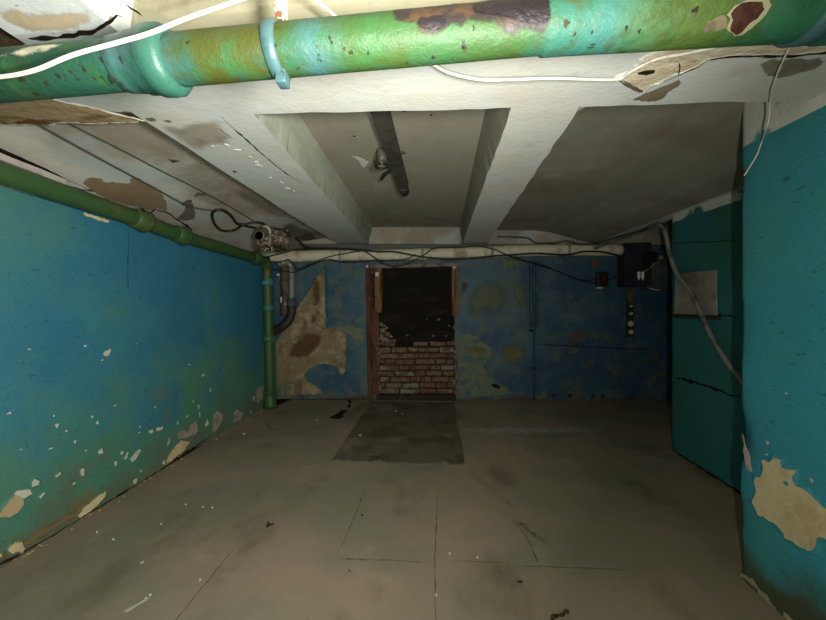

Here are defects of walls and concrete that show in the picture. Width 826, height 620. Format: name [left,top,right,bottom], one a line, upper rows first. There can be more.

spalling [0,15,122,47]
peeling [703,0,772,36]
spalling [613,45,826,93]
damp [761,58,823,78]
spalling [0,99,155,125]
crack [220,126,302,183]
damp [83,177,167,211]
peeling [276,268,365,399]
crack [676,377,741,398]
peeling [0,477,46,520]
peeling [742,434,826,556]
peeling [0,490,107,562]